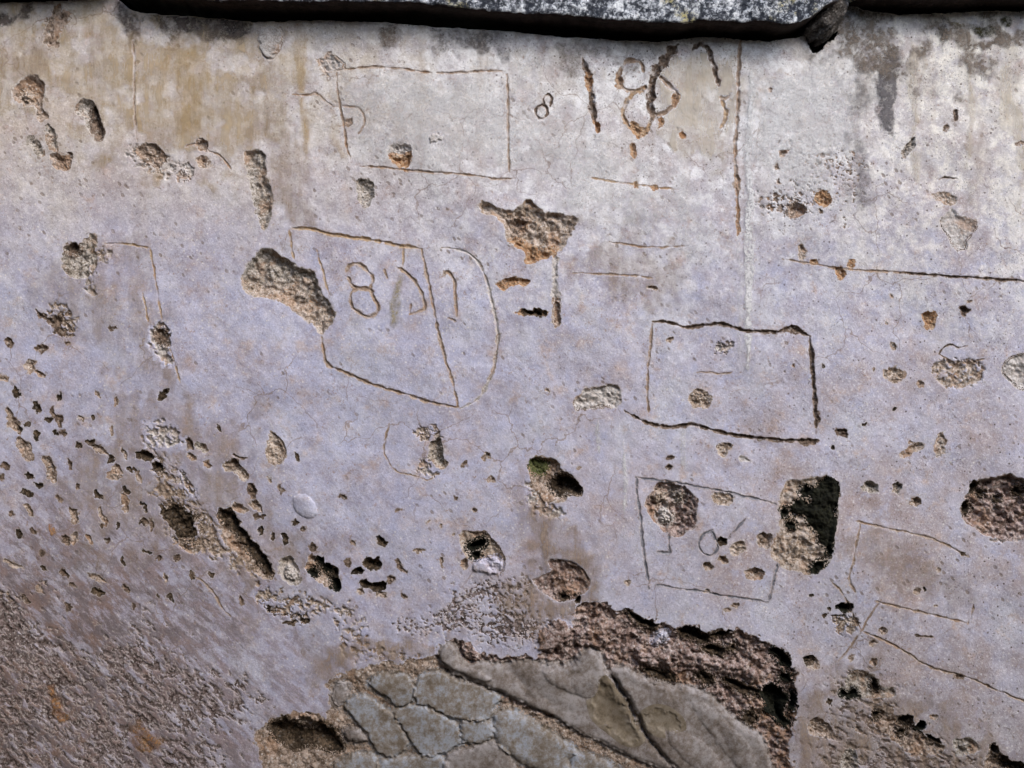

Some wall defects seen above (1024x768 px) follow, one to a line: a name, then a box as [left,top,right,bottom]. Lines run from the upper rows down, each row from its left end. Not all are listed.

spalling [471,195,584,332]
damp [744,6,1024,370]
spalling [0,228,1024,768]